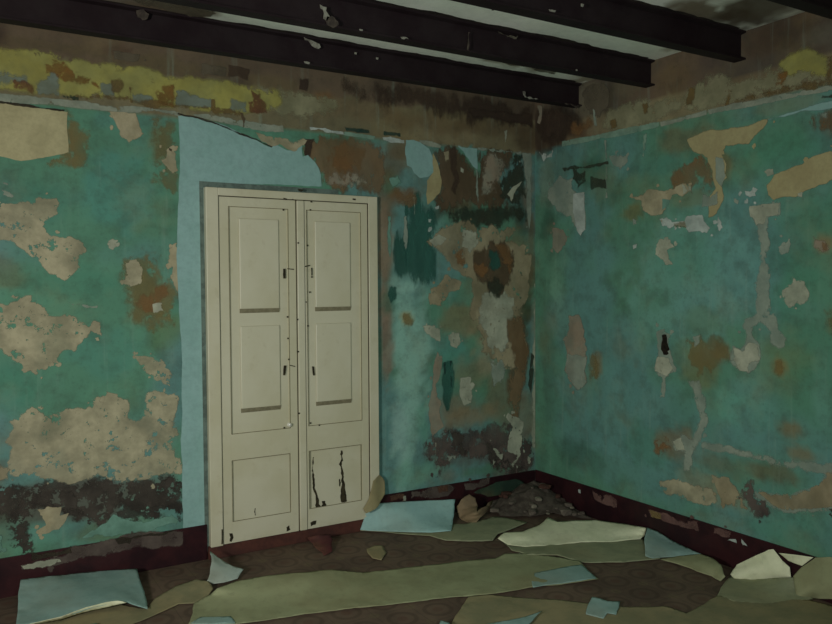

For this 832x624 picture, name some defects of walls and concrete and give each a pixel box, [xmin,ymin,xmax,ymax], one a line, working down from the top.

peeling [0,182,86,281]
peeling [630,119,775,265]
peeling [734,145,832,204]
peeling [0,295,102,379]
peeling [0,351,182,489]
rust [124,256,175,329]
flaking render [423,218,532,386]
leakage [425,317,534,477]
flaking render [490,411,531,468]
flaking render [655,322,677,397]
leakage [673,381,832,523]
leakage [0,475,183,554]